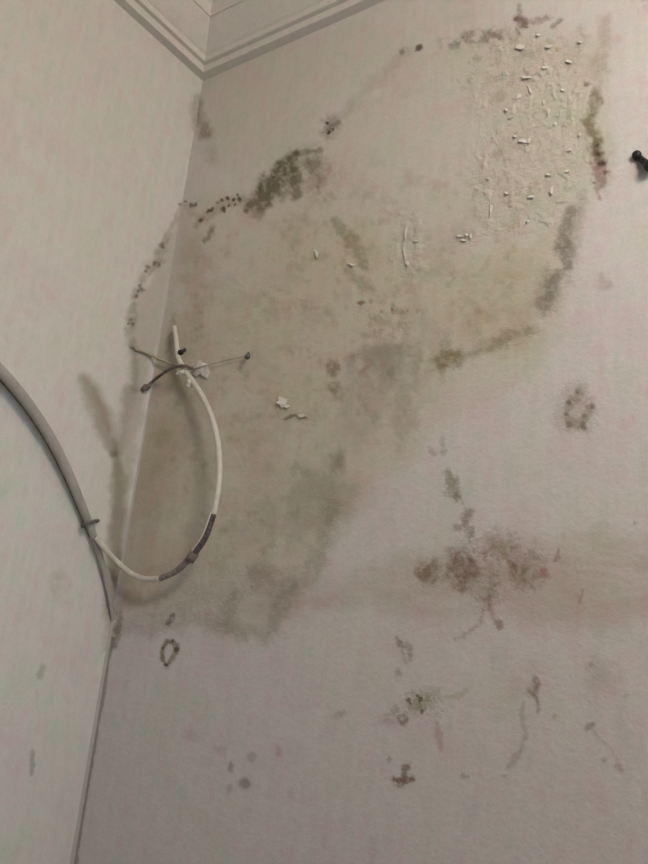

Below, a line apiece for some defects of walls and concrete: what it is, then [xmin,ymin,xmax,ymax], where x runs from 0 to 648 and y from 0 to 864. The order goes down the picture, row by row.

damp [98,0,648,671]
peeling [443,17,607,248]